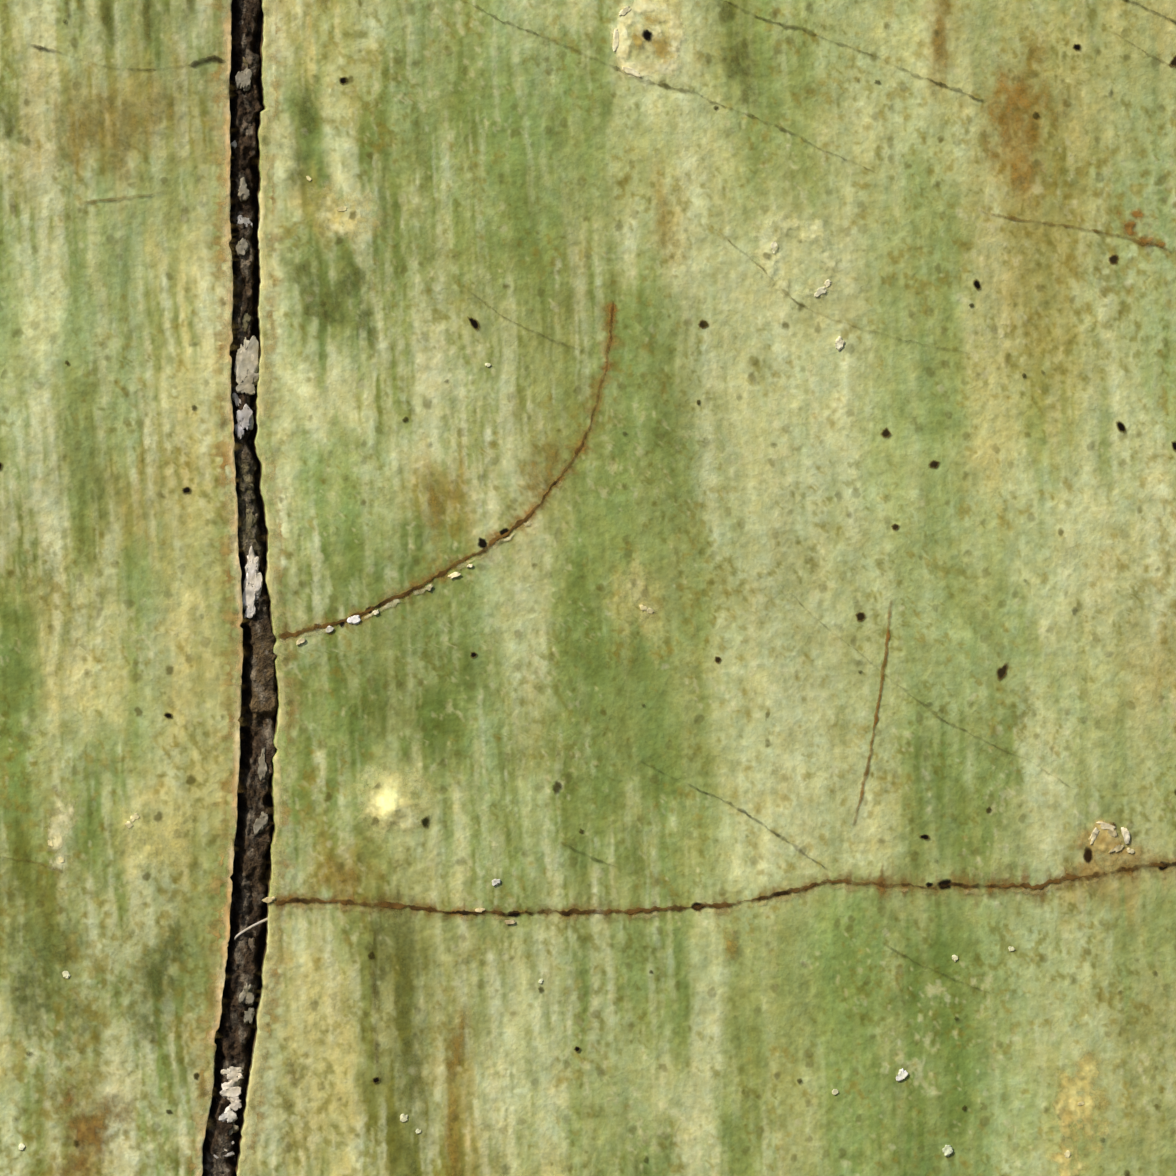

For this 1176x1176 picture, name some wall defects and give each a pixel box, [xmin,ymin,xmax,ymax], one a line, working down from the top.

crack [602,303,617,373]
crack [188,0,586,1176]
crack [378,860,1176,925]